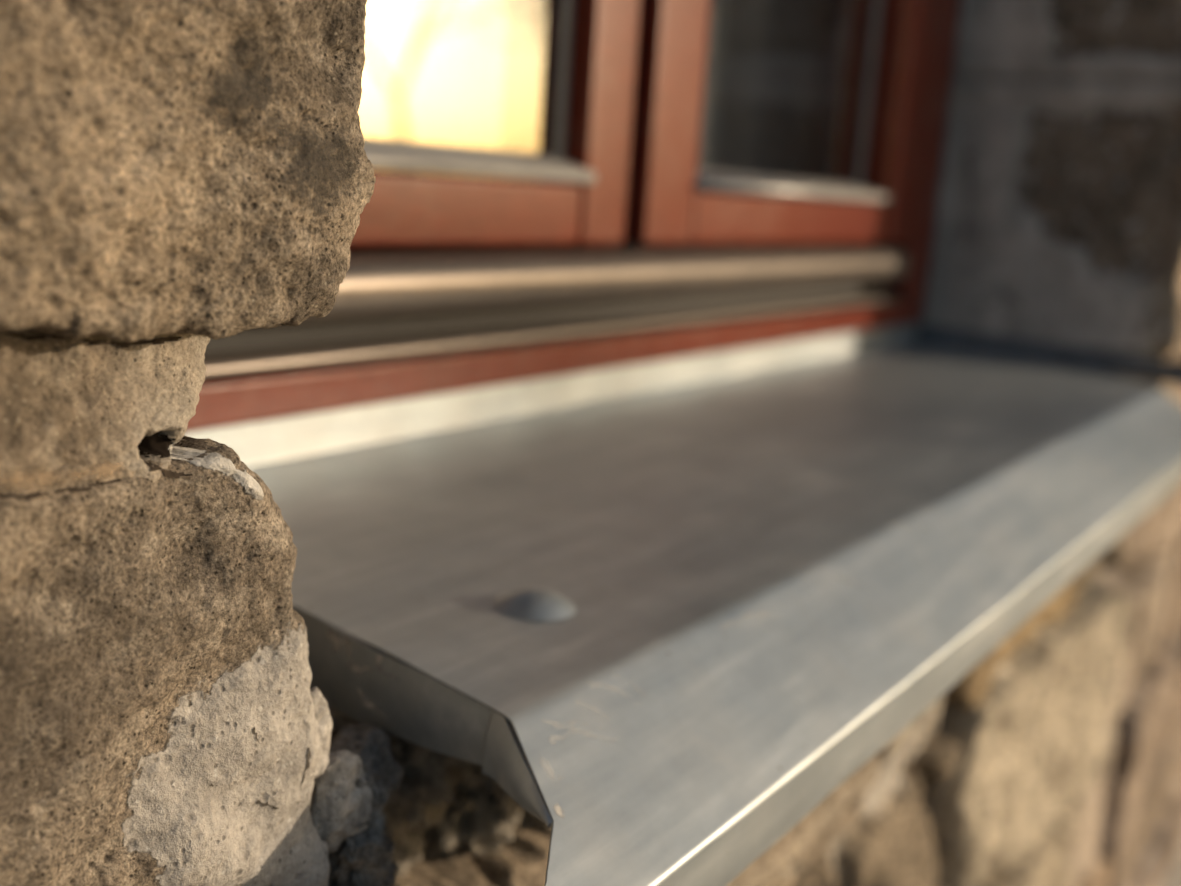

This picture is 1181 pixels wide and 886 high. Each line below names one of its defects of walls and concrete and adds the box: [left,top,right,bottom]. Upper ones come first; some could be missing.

crack [5,332,181,348]
crack [144,461,193,479]
crack [0,479,122,500]
spalling [325,698,563,886]